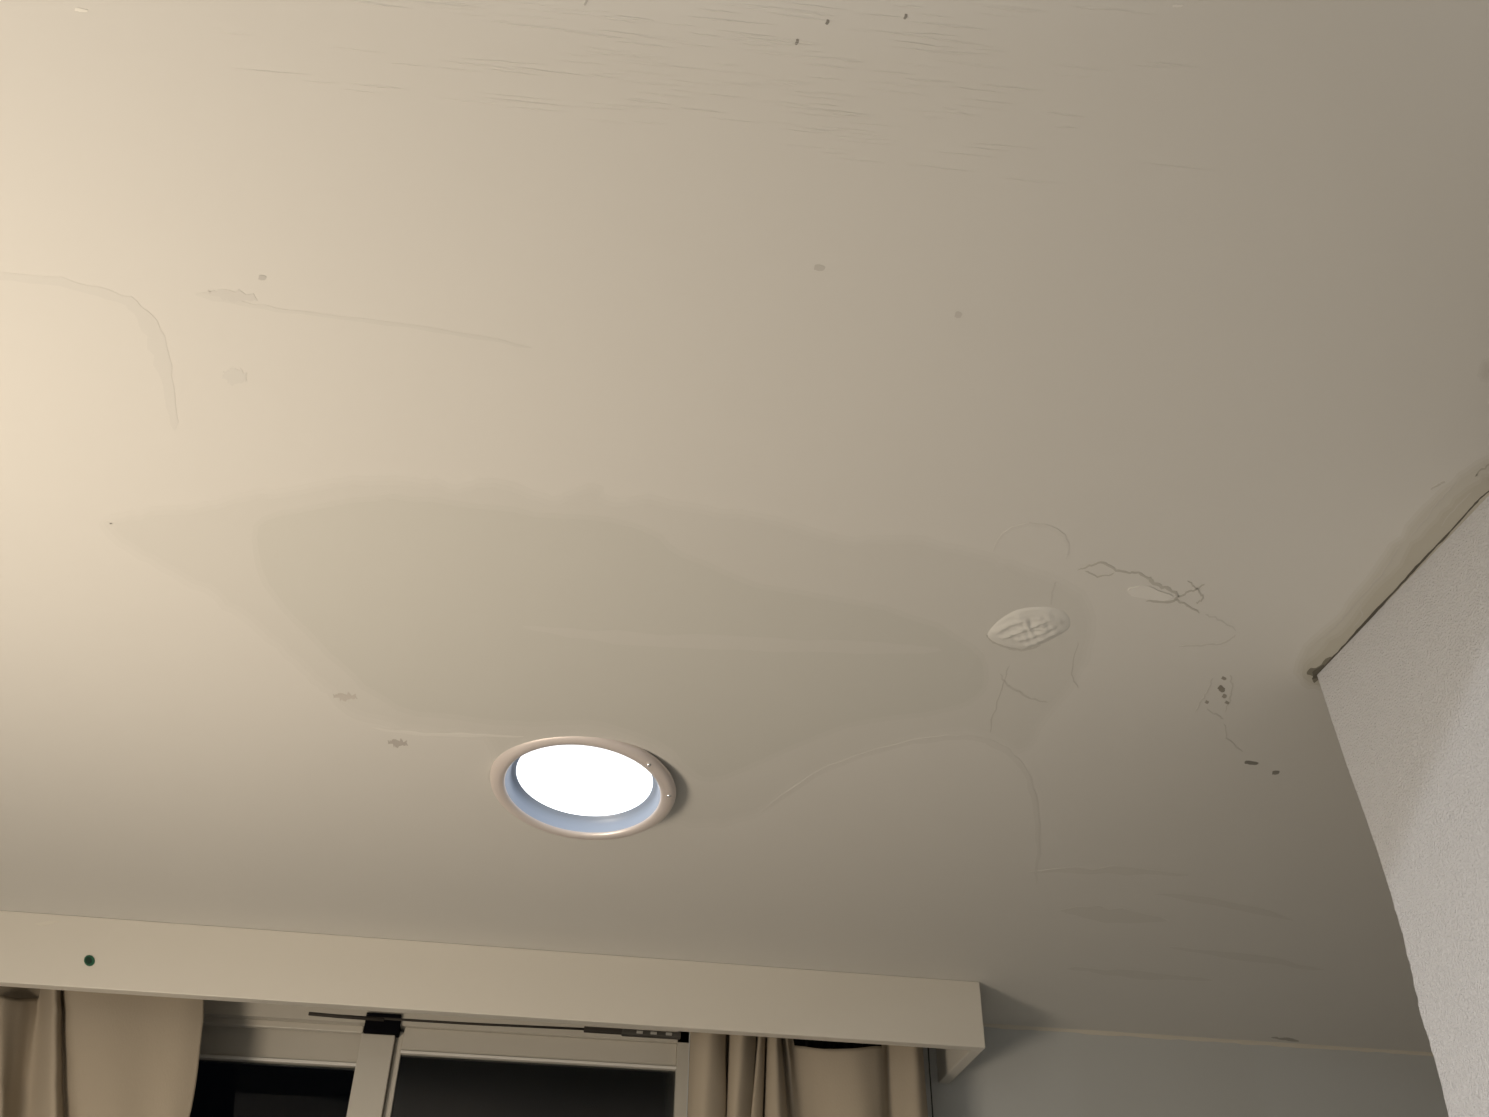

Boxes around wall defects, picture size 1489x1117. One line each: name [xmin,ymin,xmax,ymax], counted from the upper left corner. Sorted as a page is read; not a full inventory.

leakage [99,475,1096,828]
crack [1077,561,1243,752]